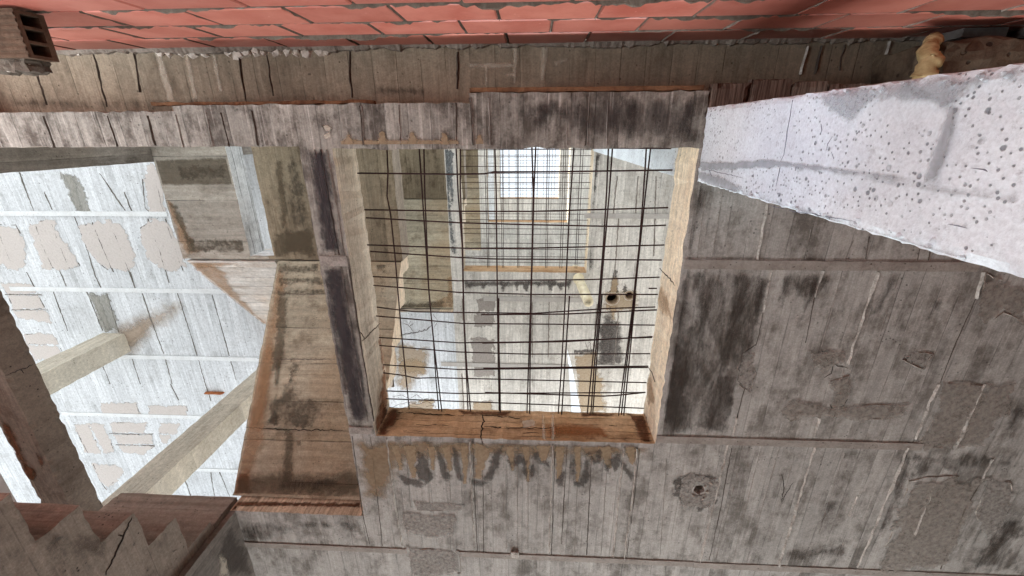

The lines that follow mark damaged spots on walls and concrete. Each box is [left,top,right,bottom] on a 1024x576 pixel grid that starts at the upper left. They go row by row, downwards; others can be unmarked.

water stain [539,100,692,135]
water stain [237,153,366,495]
corrosion [191,263,650,510]
crack [396,412,552,443]
water stain [663,274,763,435]
spalling [918,382,1014,452]
crack [106,518,132,575]
spalling [673,474,720,512]
spalling [880,475,987,573]